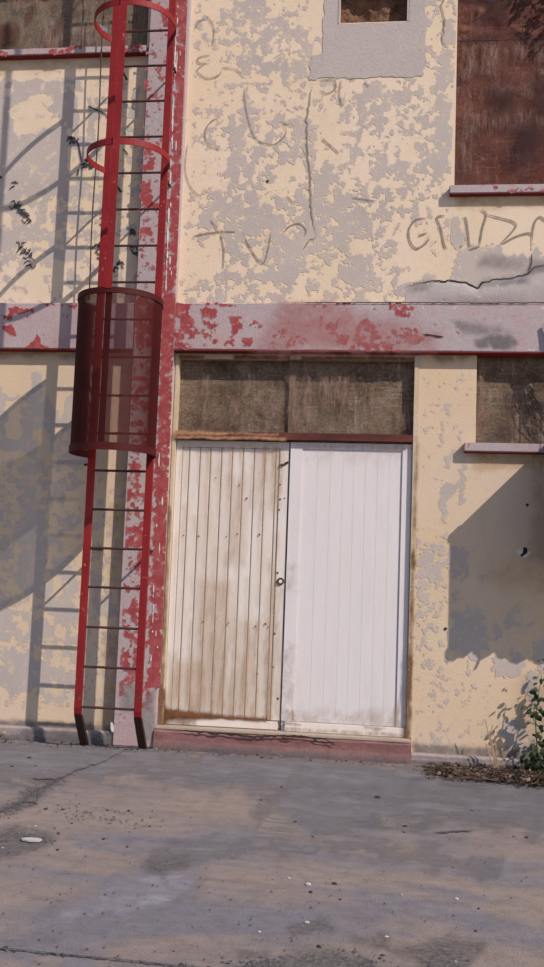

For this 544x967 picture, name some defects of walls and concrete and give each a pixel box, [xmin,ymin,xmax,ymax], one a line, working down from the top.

crack [305,254,544,304]
peeling [0,0,544,754]
rust [158,683,271,725]